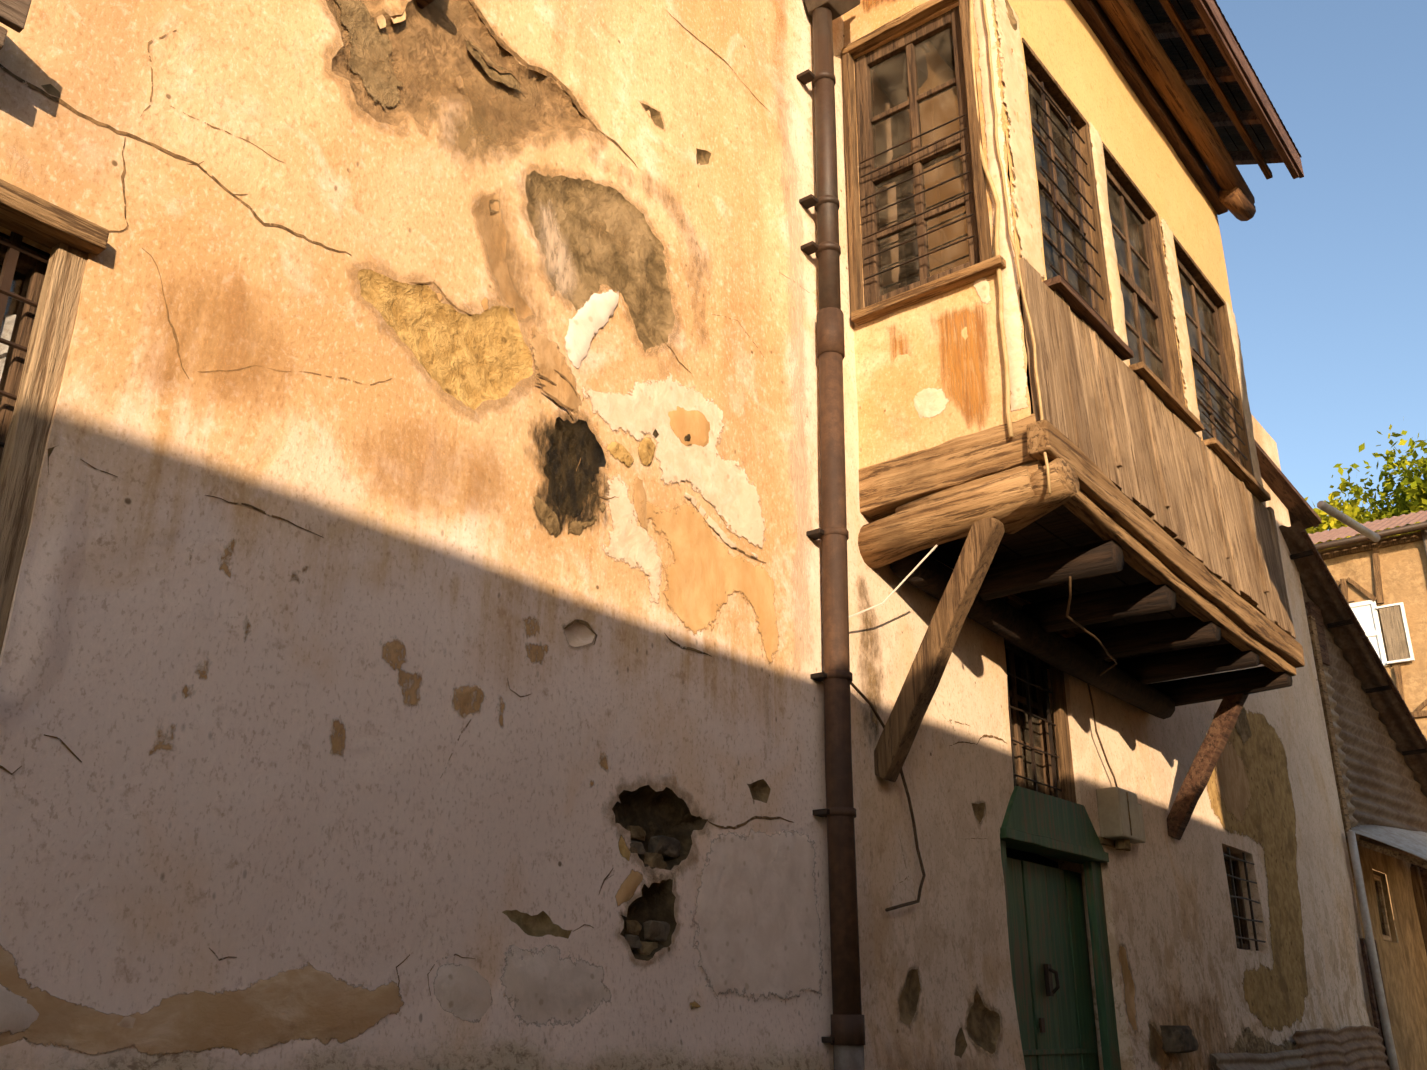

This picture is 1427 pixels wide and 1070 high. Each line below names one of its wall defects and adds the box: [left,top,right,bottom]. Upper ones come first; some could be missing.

crack [0,30,392,385]
spalling [326,0,599,147]
spalling [640,102,664,129]
spalling [696,148,711,165]
spalling [357,170,780,676]
peeling [779,101,810,657]
spalling [612,785,708,961]
peeling [1207,707,1308,1054]
peeling [0,945,404,1056]
spalling [899,969,921,1027]
spalling [954,990,1000,1058]